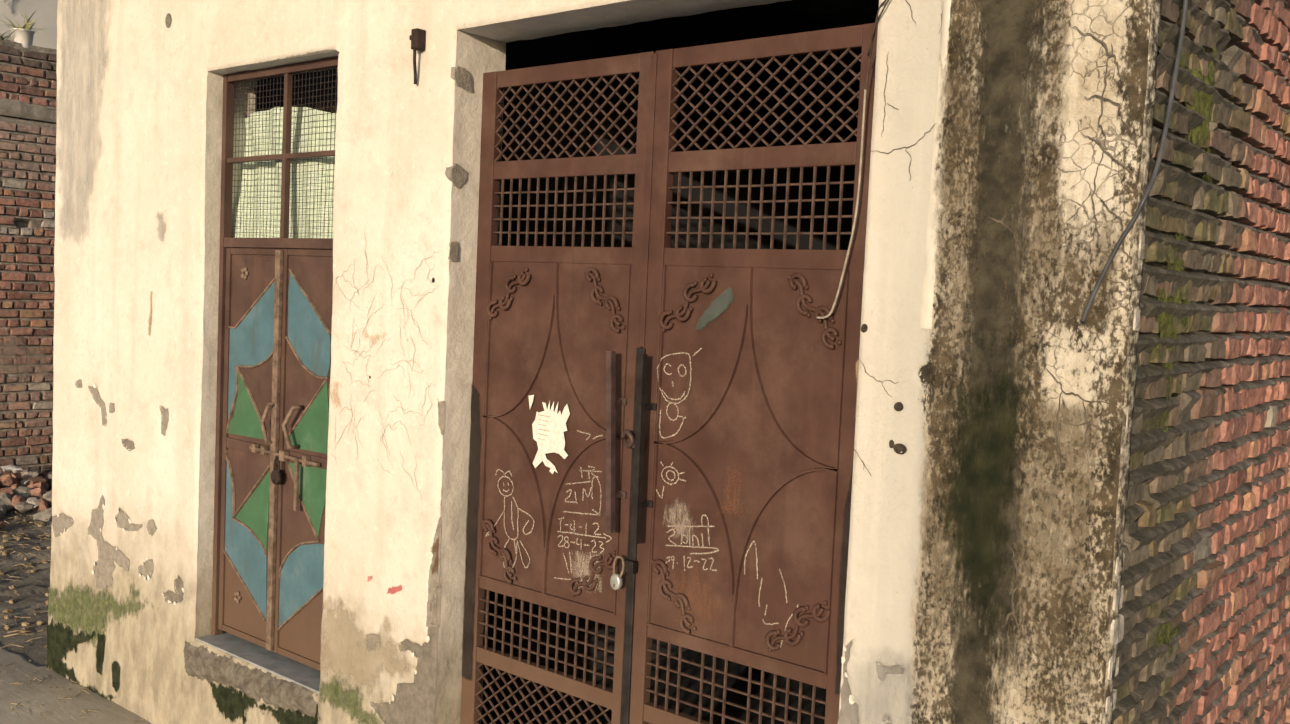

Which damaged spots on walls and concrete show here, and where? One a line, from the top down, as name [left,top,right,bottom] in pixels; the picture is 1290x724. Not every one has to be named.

crack [1072,26,1133,263]
crack [987,212,1018,241]
crack [331,228,436,496]
leakage [910,0,1152,724]
peeling [75,379,115,427]
spalling [122,439,135,451]
peeling [160,406,169,436]
spalling [434,399,446,438]
peeling [52,495,157,588]
spalling [162,575,184,605]
peeling [365,634,380,650]
spalling [371,517,441,724]